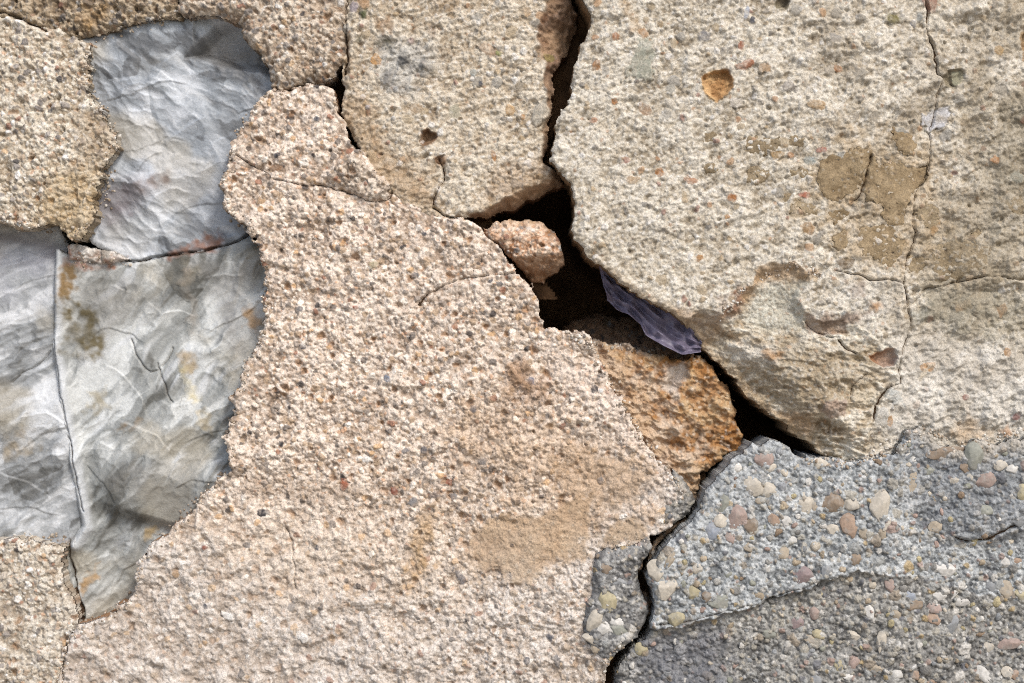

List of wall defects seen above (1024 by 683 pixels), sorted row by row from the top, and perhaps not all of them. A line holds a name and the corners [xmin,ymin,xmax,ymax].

crack [543,0,587,166]
crack [418,160,635,330]
crack [805,0,1020,421]
crack [693,352,812,453]
crack [638,535,654,595]
crack [955,525,1015,541]
crack [605,651,619,683]